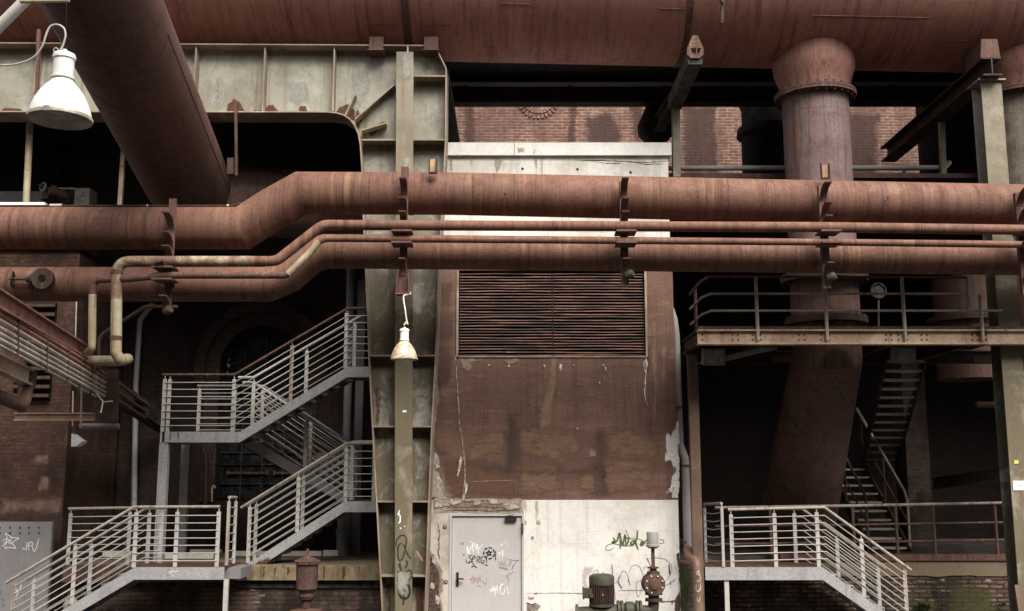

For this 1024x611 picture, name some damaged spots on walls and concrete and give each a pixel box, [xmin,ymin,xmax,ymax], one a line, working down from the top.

corrosion [227,99,277,111]
corrosion [337,104,385,137]
corrosion [89,220,1024,294]
spalling [432,449,523,513]
crack [455,356,519,499]
peeling [665,421,680,498]